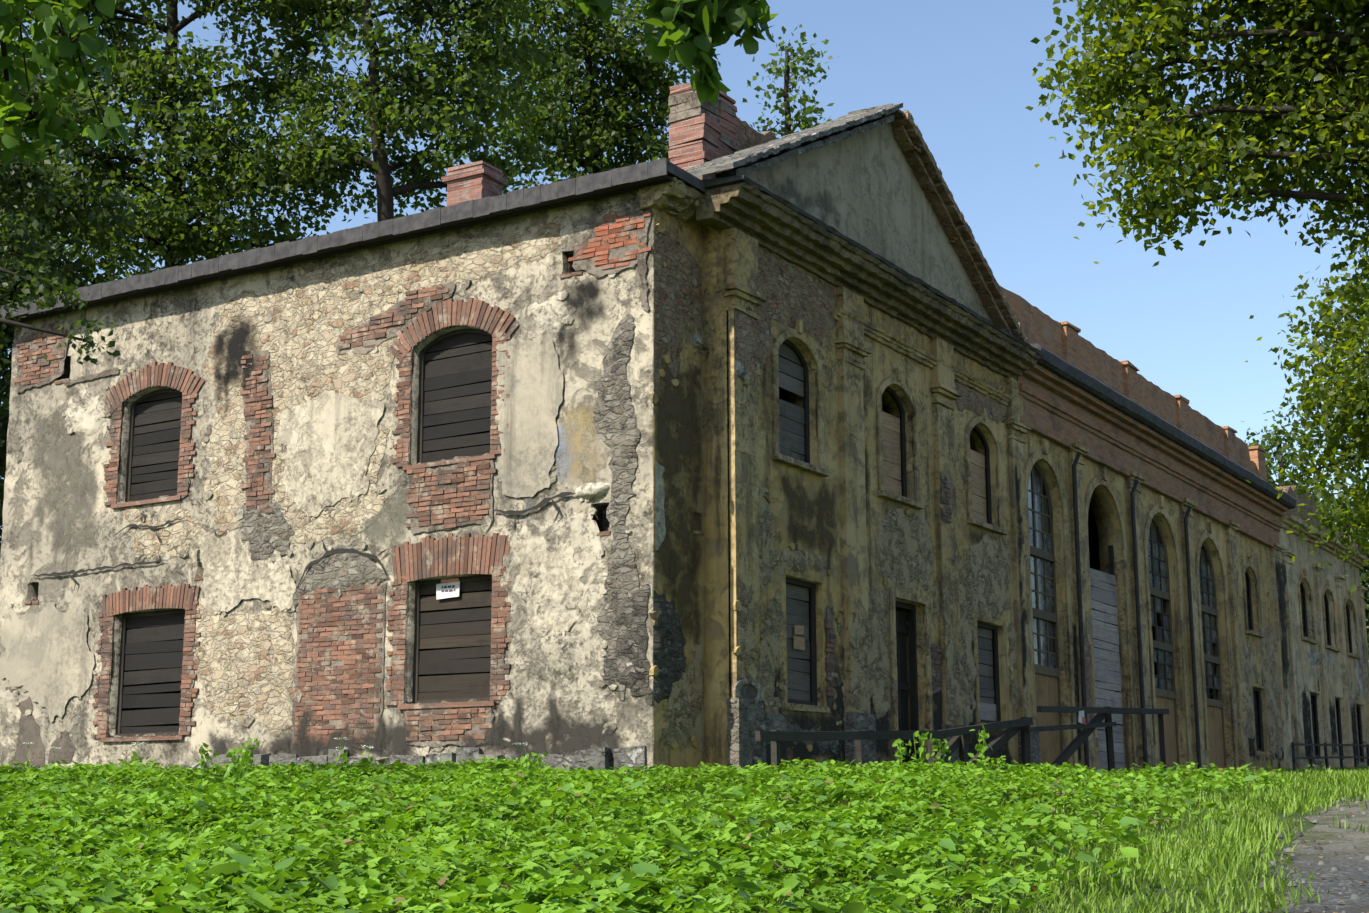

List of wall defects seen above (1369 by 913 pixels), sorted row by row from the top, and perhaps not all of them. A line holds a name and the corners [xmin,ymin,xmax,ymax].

flaking render [13,323,119,436]
water stain [216,369,250,392]
crack [31,518,183,589]
flaking render [124,209,704,755]
crack [493,492,576,531]
water stain [782,476,837,577]